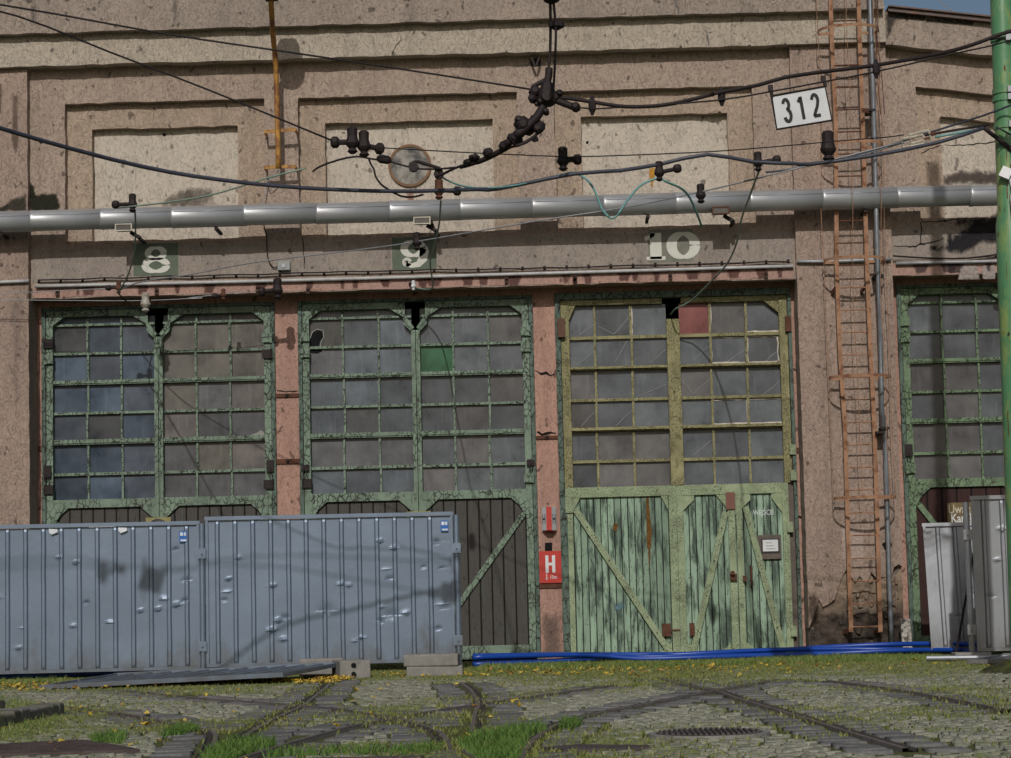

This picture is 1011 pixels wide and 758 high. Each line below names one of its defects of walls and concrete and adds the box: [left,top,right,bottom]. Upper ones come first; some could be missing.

flaking render [809,565,904,647]